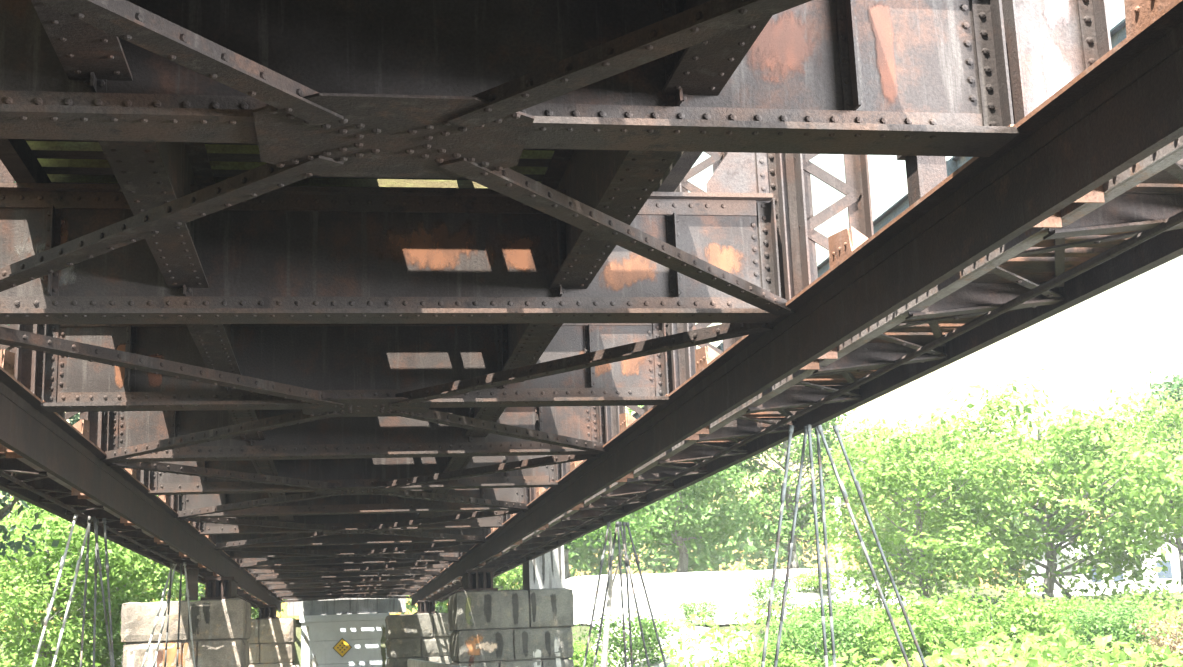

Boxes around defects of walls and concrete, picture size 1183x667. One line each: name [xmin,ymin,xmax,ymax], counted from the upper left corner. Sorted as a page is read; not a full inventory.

rust [750,12,814,81]
rust [869,2,897,102]
rust [599,254,656,290]
rust [705,243,743,273]